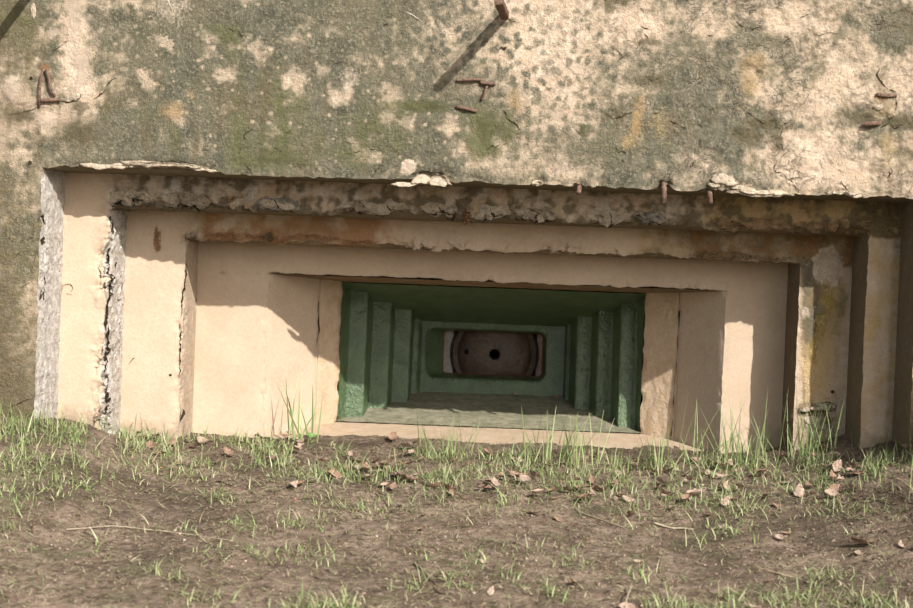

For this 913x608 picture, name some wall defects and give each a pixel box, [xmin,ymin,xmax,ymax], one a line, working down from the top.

rust [494,0,509,20]
rust [38,64,60,106]
crack [876,68,911,129]
spalling [391,172,452,187]
spalling [341,199,408,217]
spalling [419,202,462,221]
spalling [472,204,559,225]
spalling [594,210,668,228]
spalling [103,248,120,417]